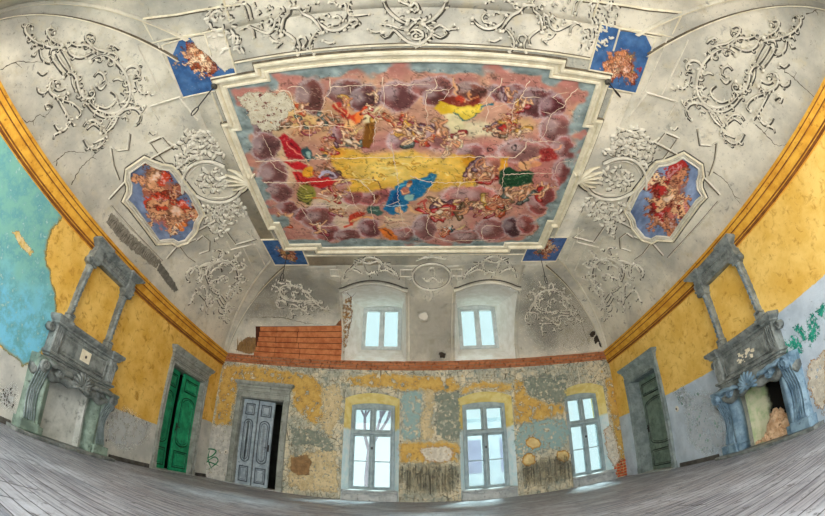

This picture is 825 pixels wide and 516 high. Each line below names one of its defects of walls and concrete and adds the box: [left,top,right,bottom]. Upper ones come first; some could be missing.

crack [255,77,577,242]
peeling [0,135,62,366]
flaking render [237,297,353,360]
peeling [287,383,344,493]
peeling [400,385,461,463]
peeling [513,418,571,466]
peeling [521,372,567,405]
spalling [805,350,825,416]